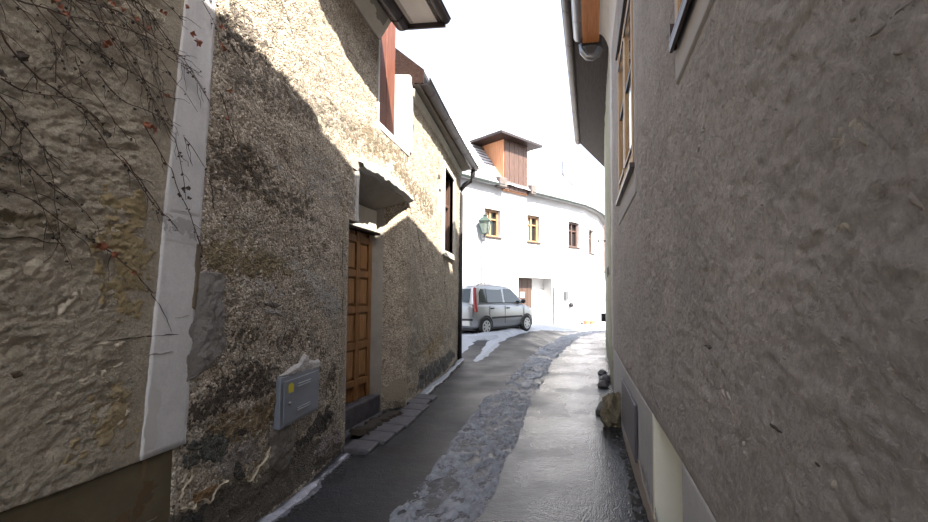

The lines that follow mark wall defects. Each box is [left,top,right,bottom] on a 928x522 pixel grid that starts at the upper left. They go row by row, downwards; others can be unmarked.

spalling [192,243,203,308]
spalling [187,317,333,445]
spalling [173,465,233,510]
peeling [246,446,271,482]